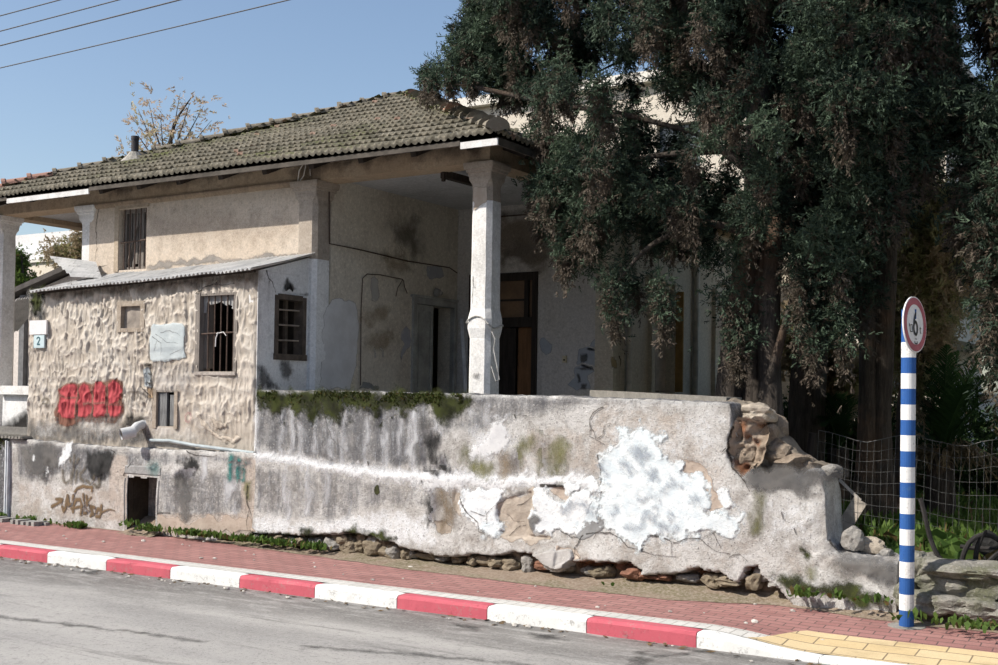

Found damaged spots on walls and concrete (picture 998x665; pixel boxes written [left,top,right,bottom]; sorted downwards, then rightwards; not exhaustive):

water stain [258,367,277,389]
water stain [280,361,292,377]
peeling [568,339,595,390]
water stain [4,411,120,484]
water stain [174,458,207,522]
water stain [254,402,588,529]
crack [589,407,604,499]
peeling [452,418,747,560]
spalling [727,402,816,474]
crack [560,530,747,561]